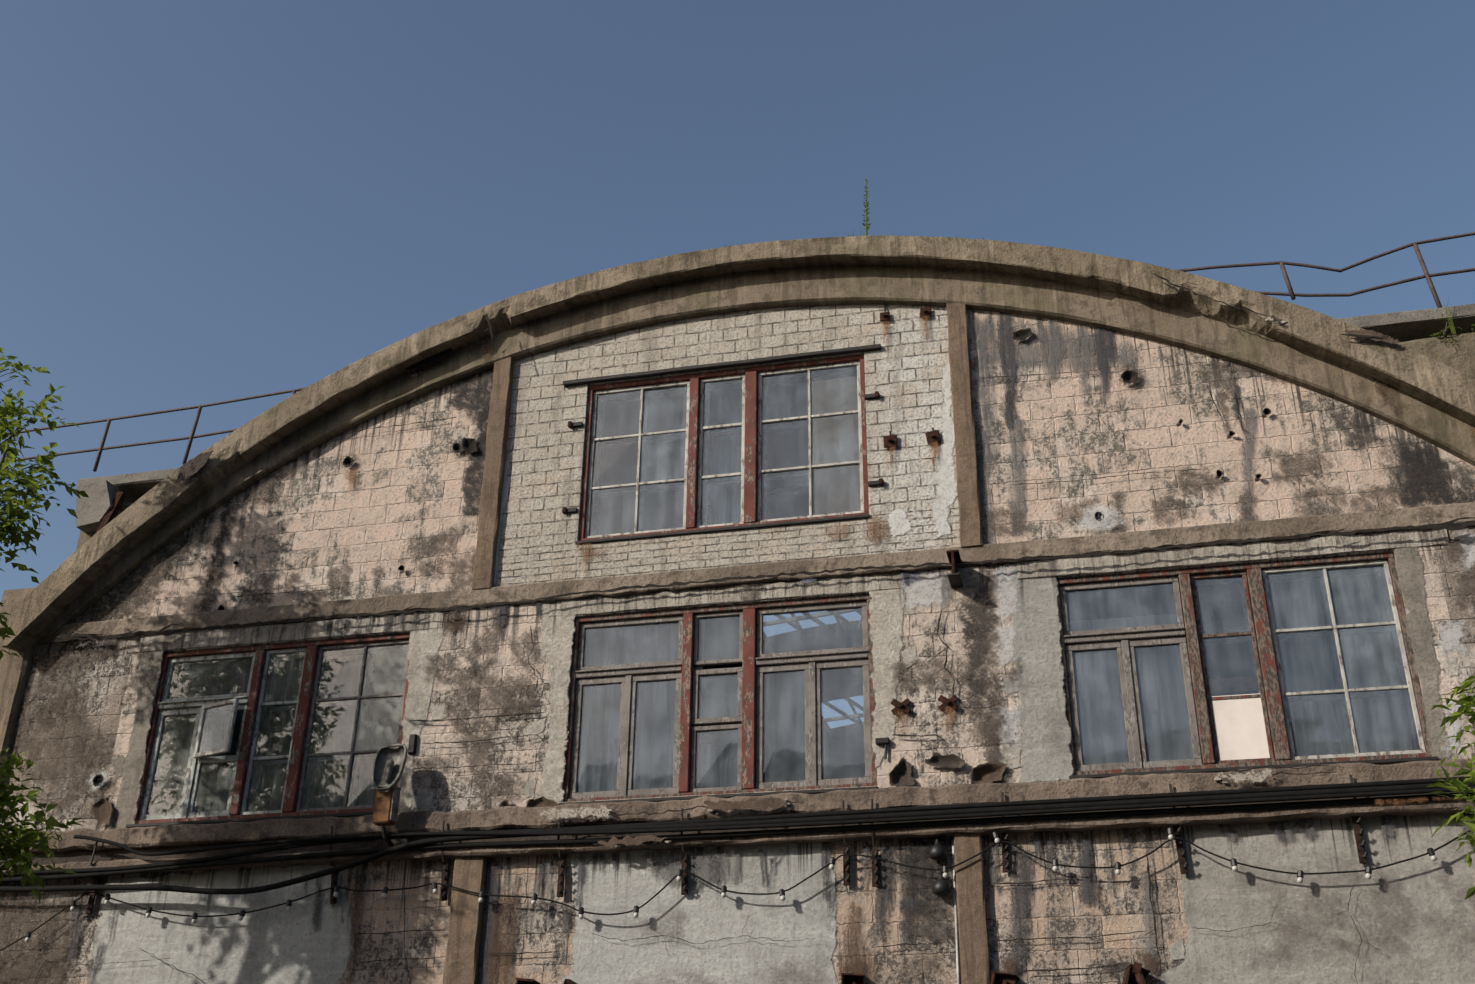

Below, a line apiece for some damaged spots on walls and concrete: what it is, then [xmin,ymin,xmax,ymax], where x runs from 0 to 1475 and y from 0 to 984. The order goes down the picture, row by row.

leakage [408,334,495,591]
leakage [973,312,1136,544]
leakage [1150,468,1223,523]
leakage [1198,361,1284,522]
leakage [1273,396,1475,517]
leakage [12,460,301,815]
leakage [241,563,350,608]
leakage [326,602,543,809]
leakage [890,567,1021,783]
crack [33,949,212,984]
crack [592,913,819,952]
leakage [861,836,953,982]